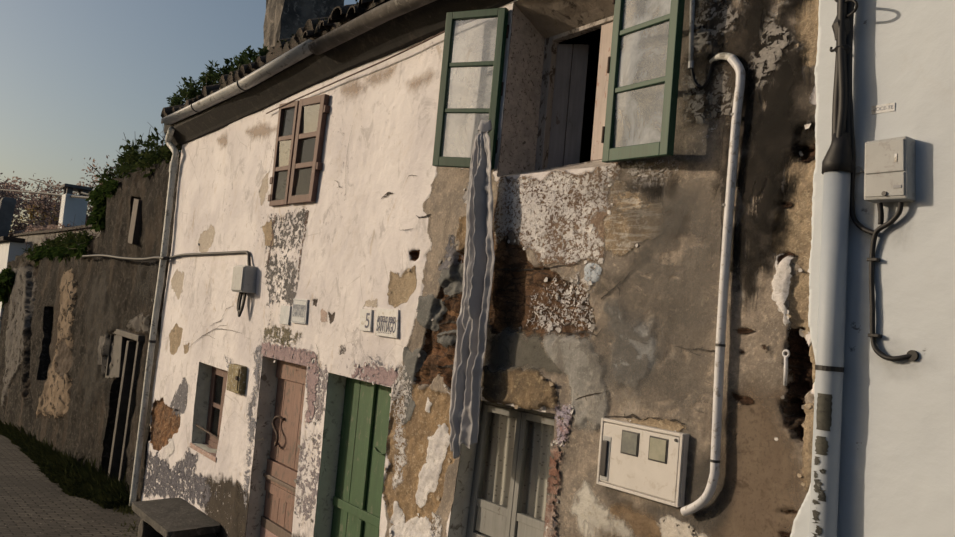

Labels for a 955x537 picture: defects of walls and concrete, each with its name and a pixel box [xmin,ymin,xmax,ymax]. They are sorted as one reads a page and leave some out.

flaking render [36,268,78,419]
flaking render [143,377,198,495]
peeling [198,225,215,253]
peeling [262,219,274,246]
peeling [243,342,328,527]
flaking render [351,167,470,537]
flaking render [481,0,819,537]
water stain [683,0,816,305]